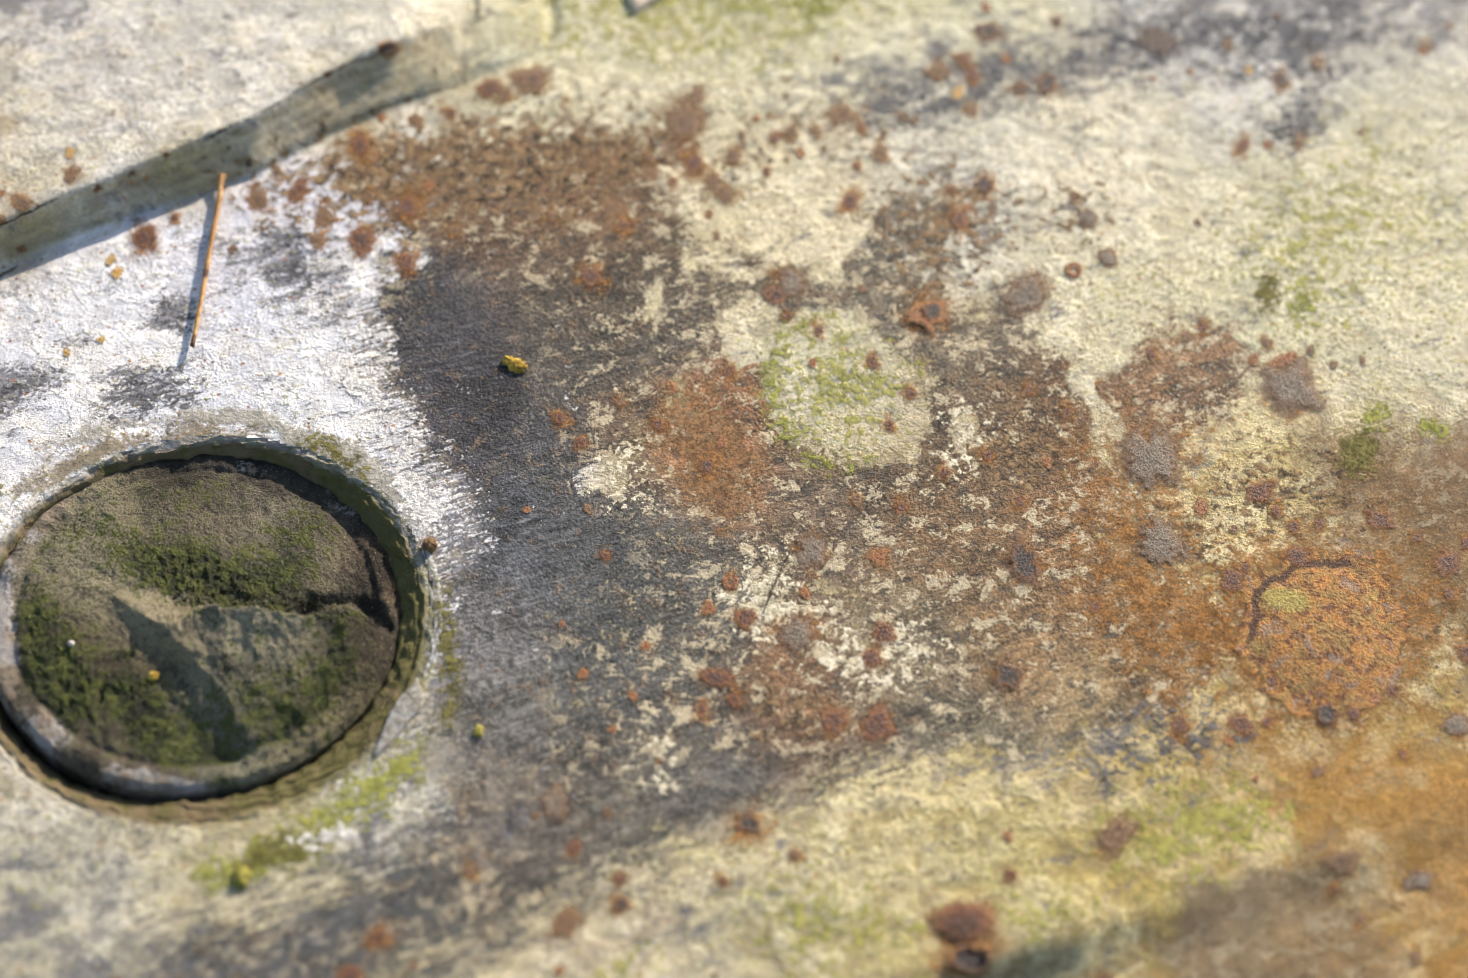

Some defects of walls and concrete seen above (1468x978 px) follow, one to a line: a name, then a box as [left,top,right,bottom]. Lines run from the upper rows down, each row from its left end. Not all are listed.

corrosion [924,53,981,116]
corrosion [1232,132,1274,160]
corrosion [205,65,1124,326]
corrosion [1180,318,1210,343]
corrosion [863,353,879,369]
corrosion [901,383,920,400]
corrosion [722,570,739,591]
corrosion [1042,381,1468,746]
corrosion [700,599,756,632]
corrosion [862,621,897,669]
corrosion [693,667,744,723]
corrosion [1154,848,1380,978]